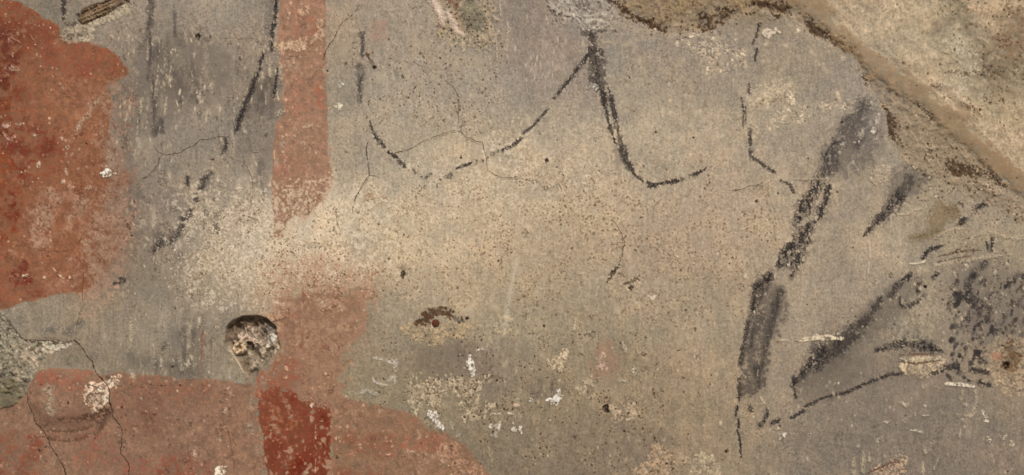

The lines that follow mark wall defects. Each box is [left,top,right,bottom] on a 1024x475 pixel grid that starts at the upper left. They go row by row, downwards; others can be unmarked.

crack [335,79,562,237]
spalling [0,310,72,418]
crack [9,94,275,475]
spalling [222,314,286,385]